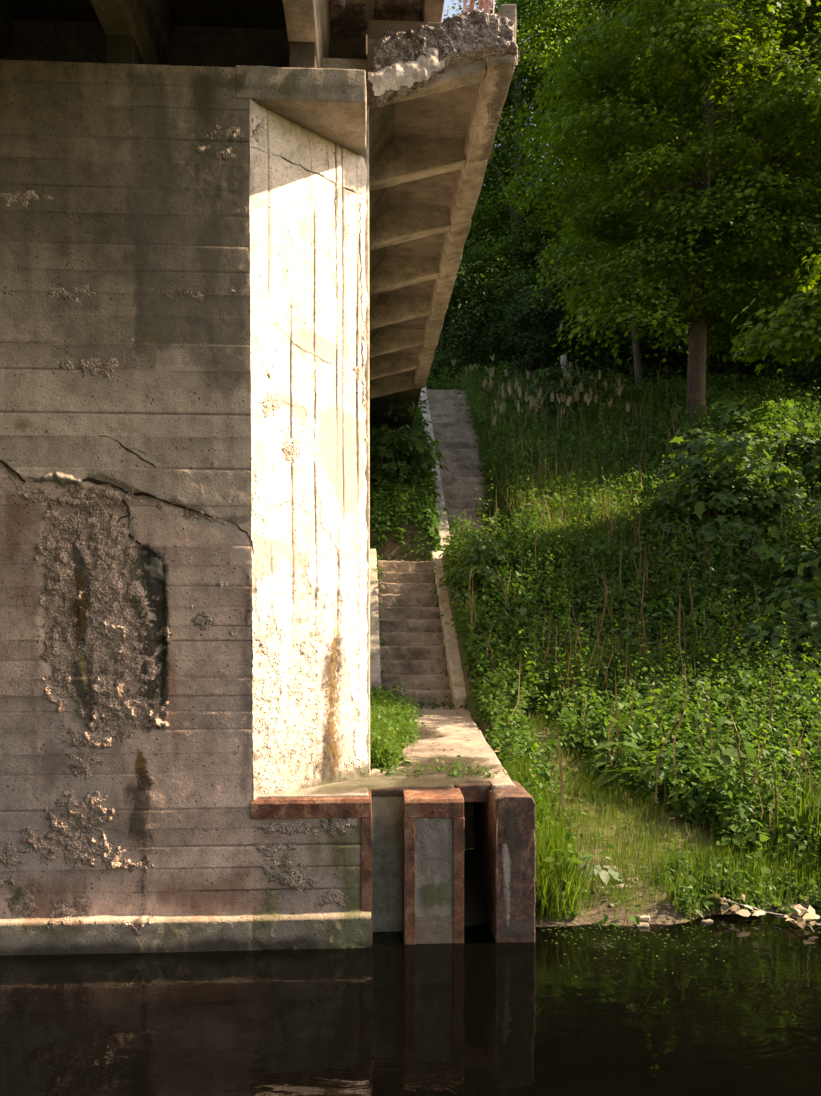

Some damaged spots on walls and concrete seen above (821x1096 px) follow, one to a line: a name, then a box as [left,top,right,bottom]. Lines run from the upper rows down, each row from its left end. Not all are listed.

spalling [0,188,54,208]
crack [252,145,365,409]
spalling [54,357,119,383]
leakage [297,329,337,362]
leakage [276,392,366,512]
crack [0,435,254,567]
leakage [245,537,327,624]
spalling [0,482,174,930]
spalling [250,818,361,908]
spalling [117,913,155,936]